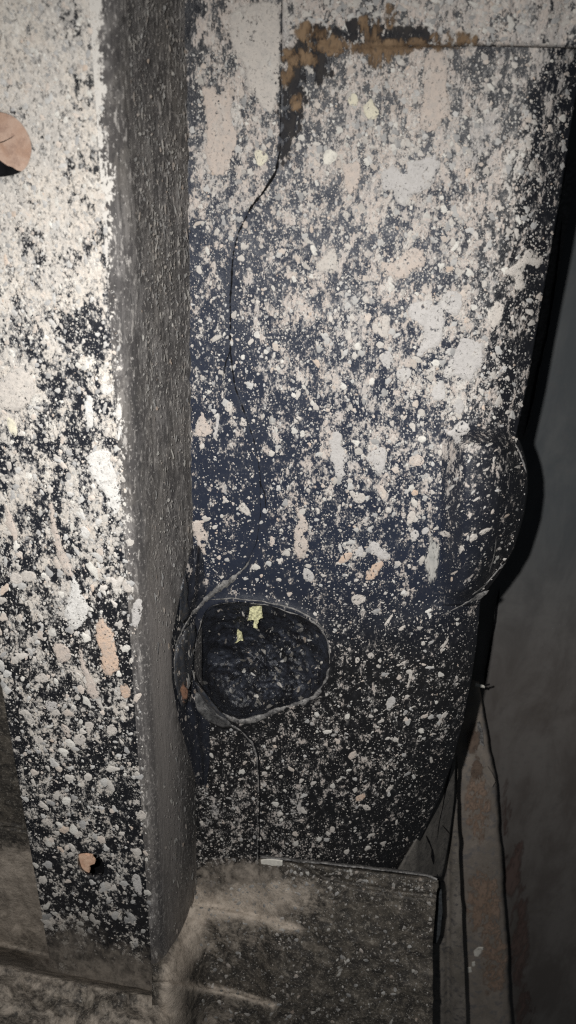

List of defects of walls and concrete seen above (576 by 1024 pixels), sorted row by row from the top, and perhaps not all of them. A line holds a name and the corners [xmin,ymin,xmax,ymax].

crack [223,0,282,570]
corrosion [281,3,478,111]